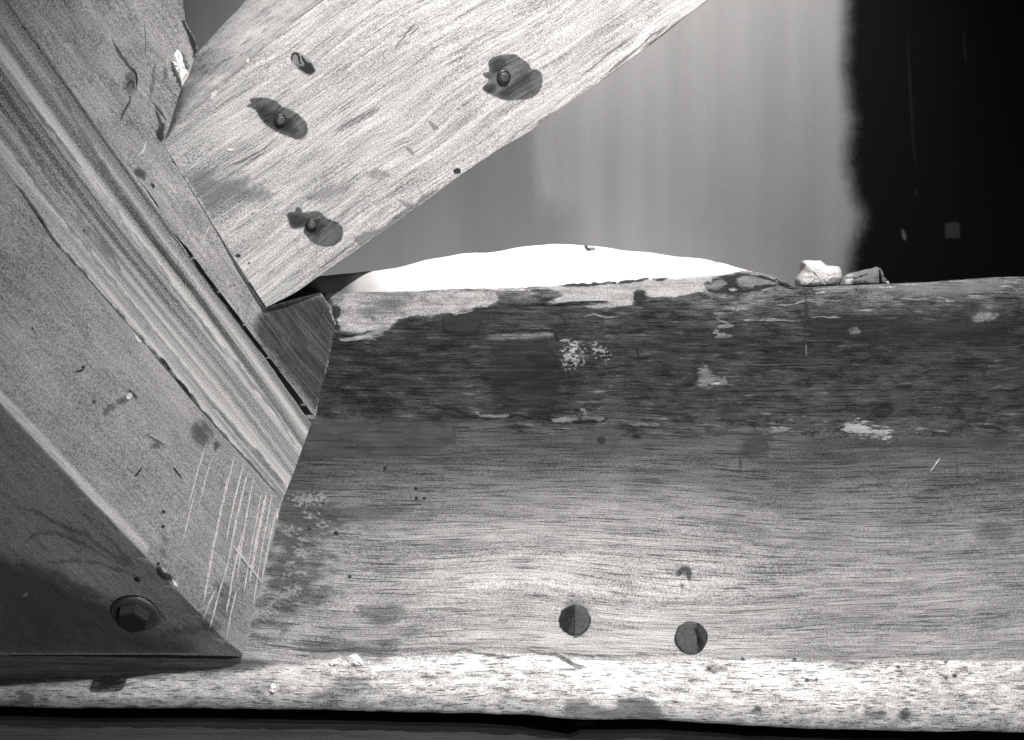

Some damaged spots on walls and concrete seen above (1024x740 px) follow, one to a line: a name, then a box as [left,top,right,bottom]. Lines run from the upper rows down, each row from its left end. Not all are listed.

peeling [697,365,728,389]
peeling [842,418,894,440]